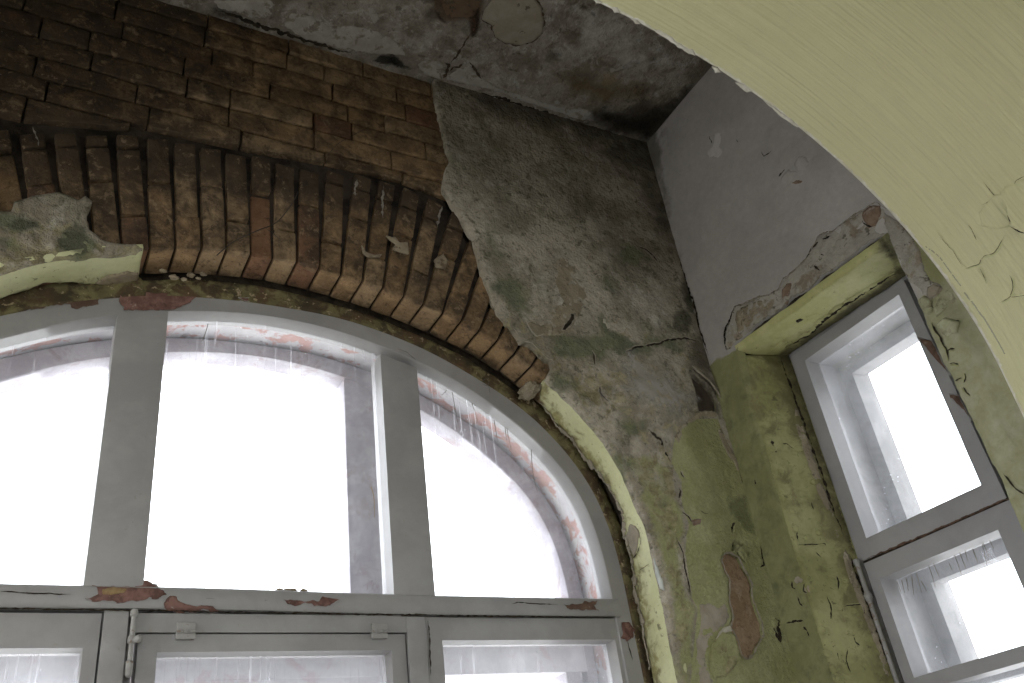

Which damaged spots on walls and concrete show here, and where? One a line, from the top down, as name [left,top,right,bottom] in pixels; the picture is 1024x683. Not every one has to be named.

peeling [284,8,405,56]
crack [443,0,546,79]
leakage [594,102,678,136]
leakage [58,225,89,253]
leakage [361,236,409,258]
leakage [434,253,448,270]
crack [939,234,1024,303]
peeling [95,271,196,311]
crack [627,245,708,353]
flaking render [539,402,665,670]
peeling [85,580,219,614]
peeling [283,596,340,607]